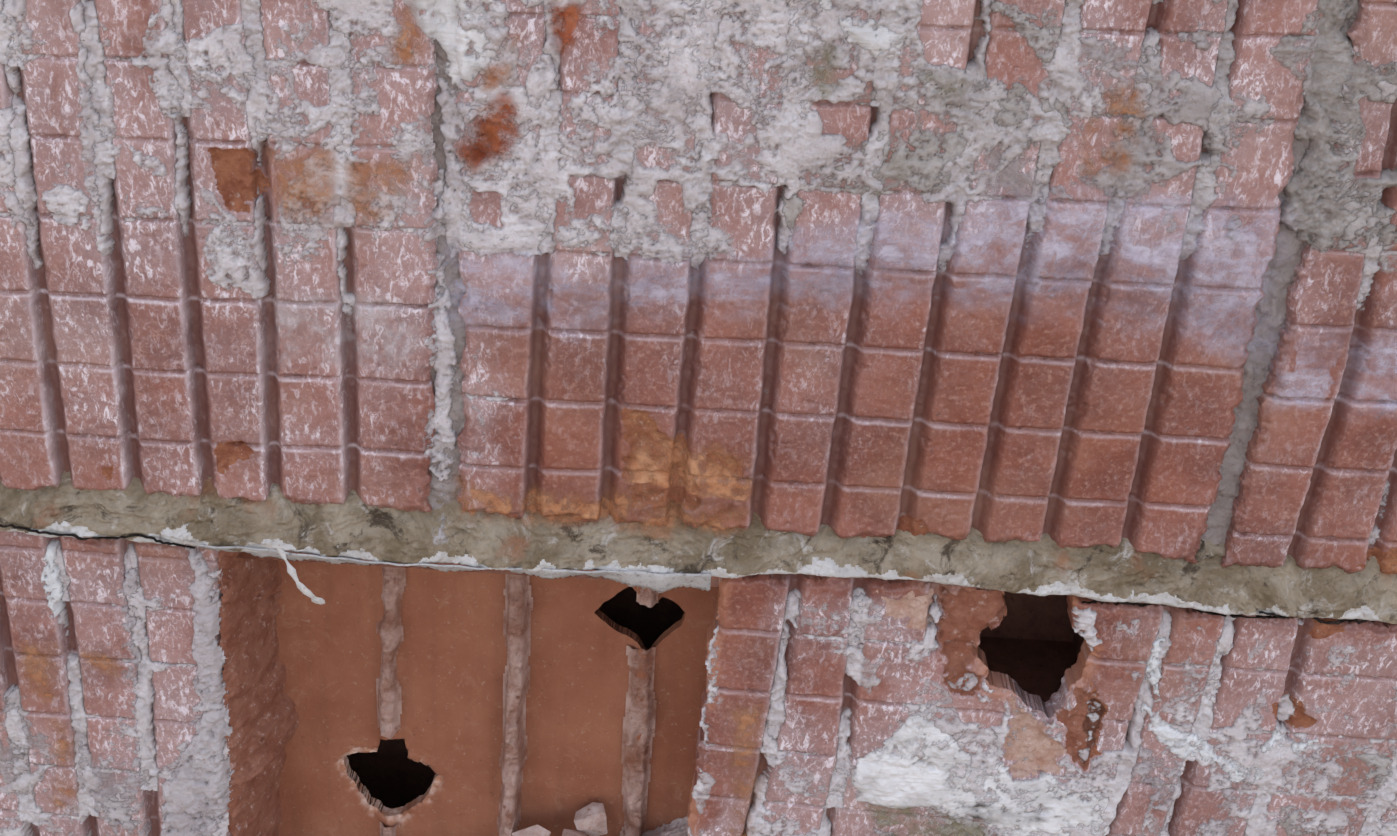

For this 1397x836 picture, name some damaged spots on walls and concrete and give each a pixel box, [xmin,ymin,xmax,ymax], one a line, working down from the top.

crack [0,524,195,549]
crack [1081,600,1396,625]
hole [978,591,1084,702]